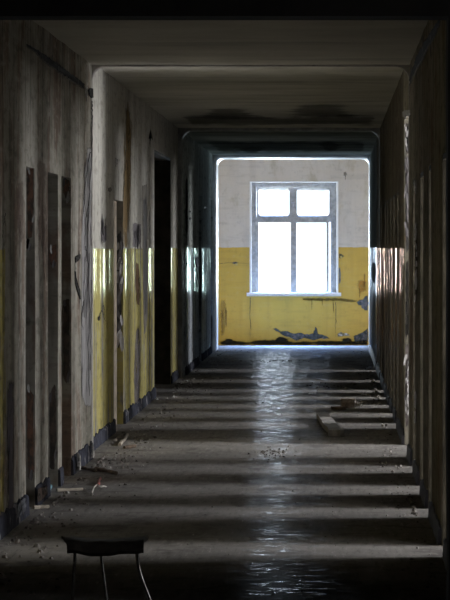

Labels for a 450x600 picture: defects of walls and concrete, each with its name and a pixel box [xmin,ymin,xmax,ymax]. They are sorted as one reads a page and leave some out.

leakage [303,298,355,311]
peeling [357,296,369,310]
leakage [221,337,367,345]
peeling [274,327,329,341]
peeling [337,328,368,342]